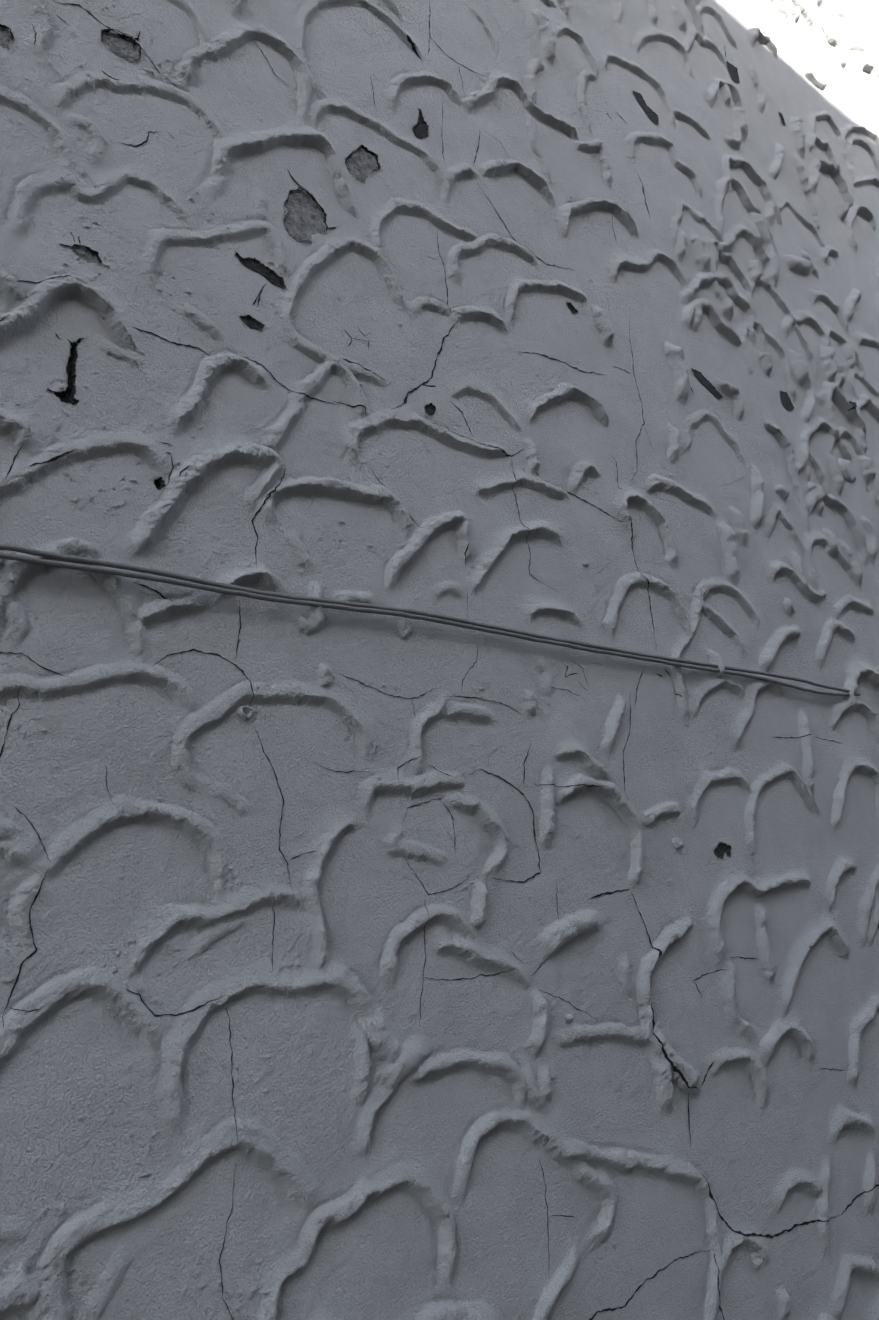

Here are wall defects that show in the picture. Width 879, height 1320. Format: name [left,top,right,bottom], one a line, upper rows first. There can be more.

spalling [0,24,14,50]
spalling [101,28,142,64]
spalling [59,232,102,264]
spalling [283,169,336,244]
spalling [345,145,381,184]
crack [133,229,682,1030]
crack [0,652,72,757]
crack [2,806,51,1026]
crack [590,889,715,1142]
crack [695,956,759,996]
crack [126,989,238,1320]
crack [589,1173,879,1320]